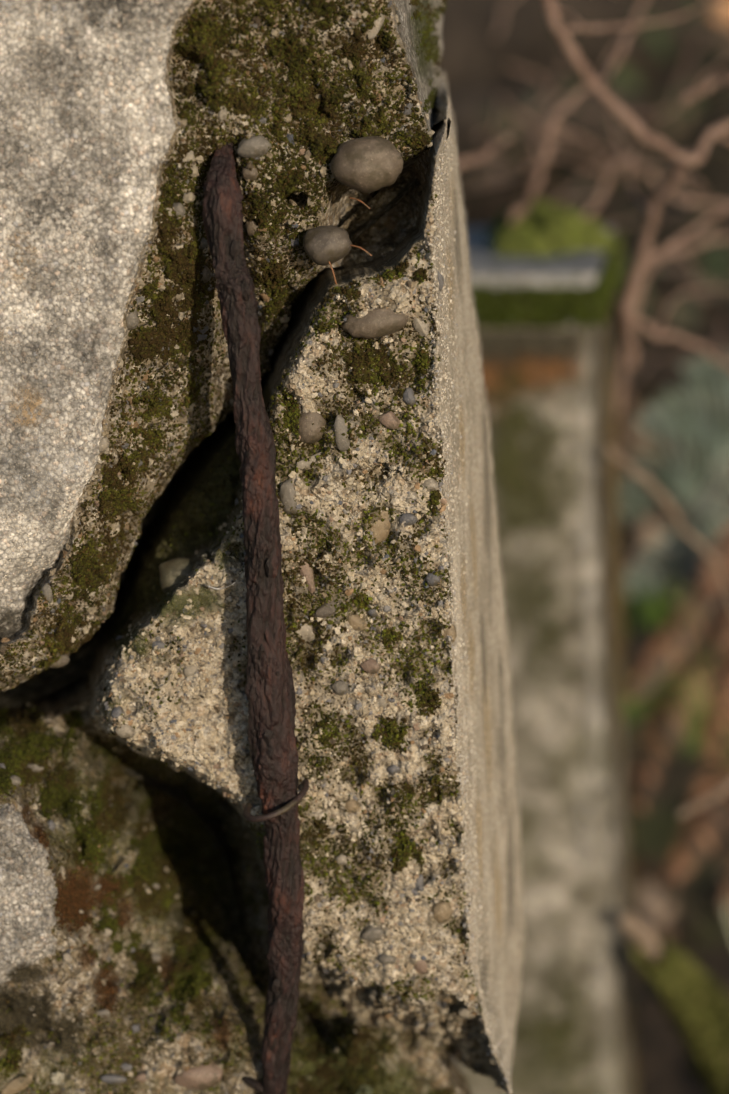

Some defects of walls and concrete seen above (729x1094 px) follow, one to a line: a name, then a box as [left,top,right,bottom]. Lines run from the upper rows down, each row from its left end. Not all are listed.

crack [347,177,419,243]
crack [431,118,451,140]
crack [273,268,325,351]
crack [0,534,158,710]
corrosion [202,142,305,1094]
spalling [0,0,512,1094]